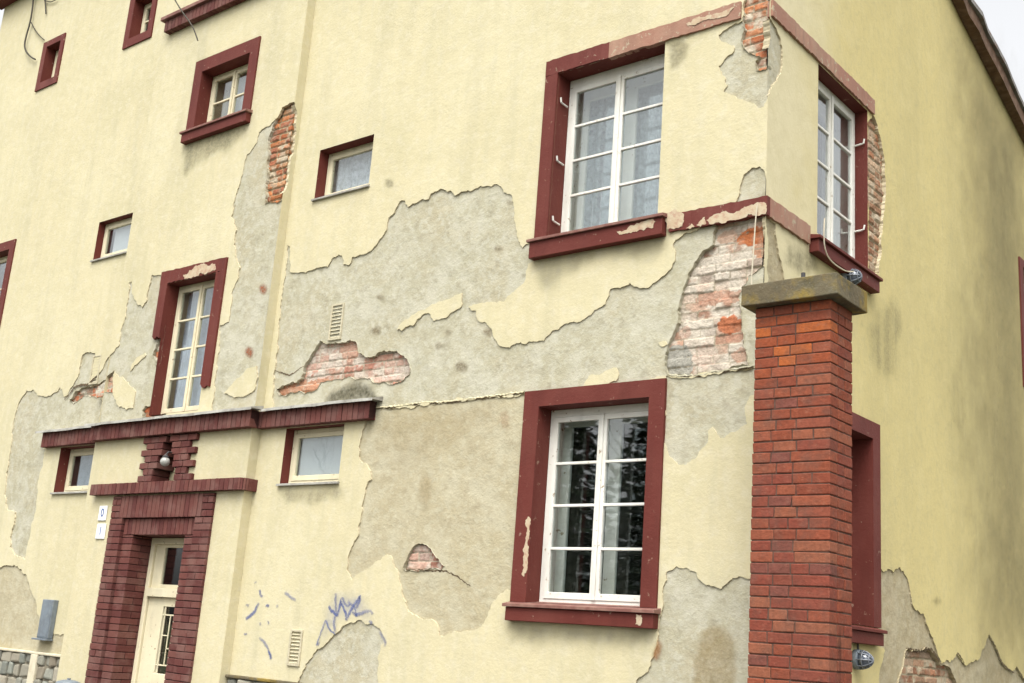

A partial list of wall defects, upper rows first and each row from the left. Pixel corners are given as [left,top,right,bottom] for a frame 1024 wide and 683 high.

peeling [686,0,783,108]
flaking render [863,115,886,275]
peeling [211,102,785,636]
peeling [0,275,166,654]
peeling [298,620,386,683]
peeling [636,566,751,683]
peeling [874,567,1024,683]